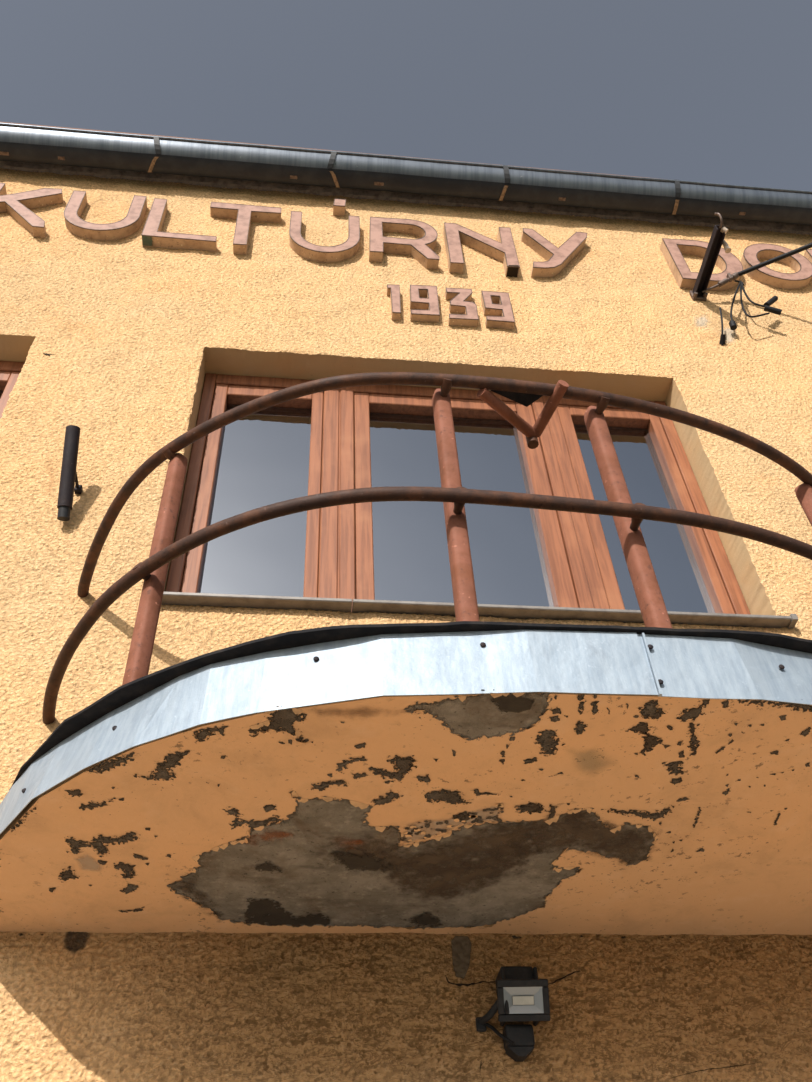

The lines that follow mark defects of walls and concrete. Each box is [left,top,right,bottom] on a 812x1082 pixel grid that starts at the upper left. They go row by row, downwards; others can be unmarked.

peeling [84,726,229,781]
peeling [248,706,313,745]
spalling [404,689,610,777]
peeling [626,699,812,785]
peeling [65,787,124,810]
peeling [49,828,157,894]
spalling [167,743,702,930]